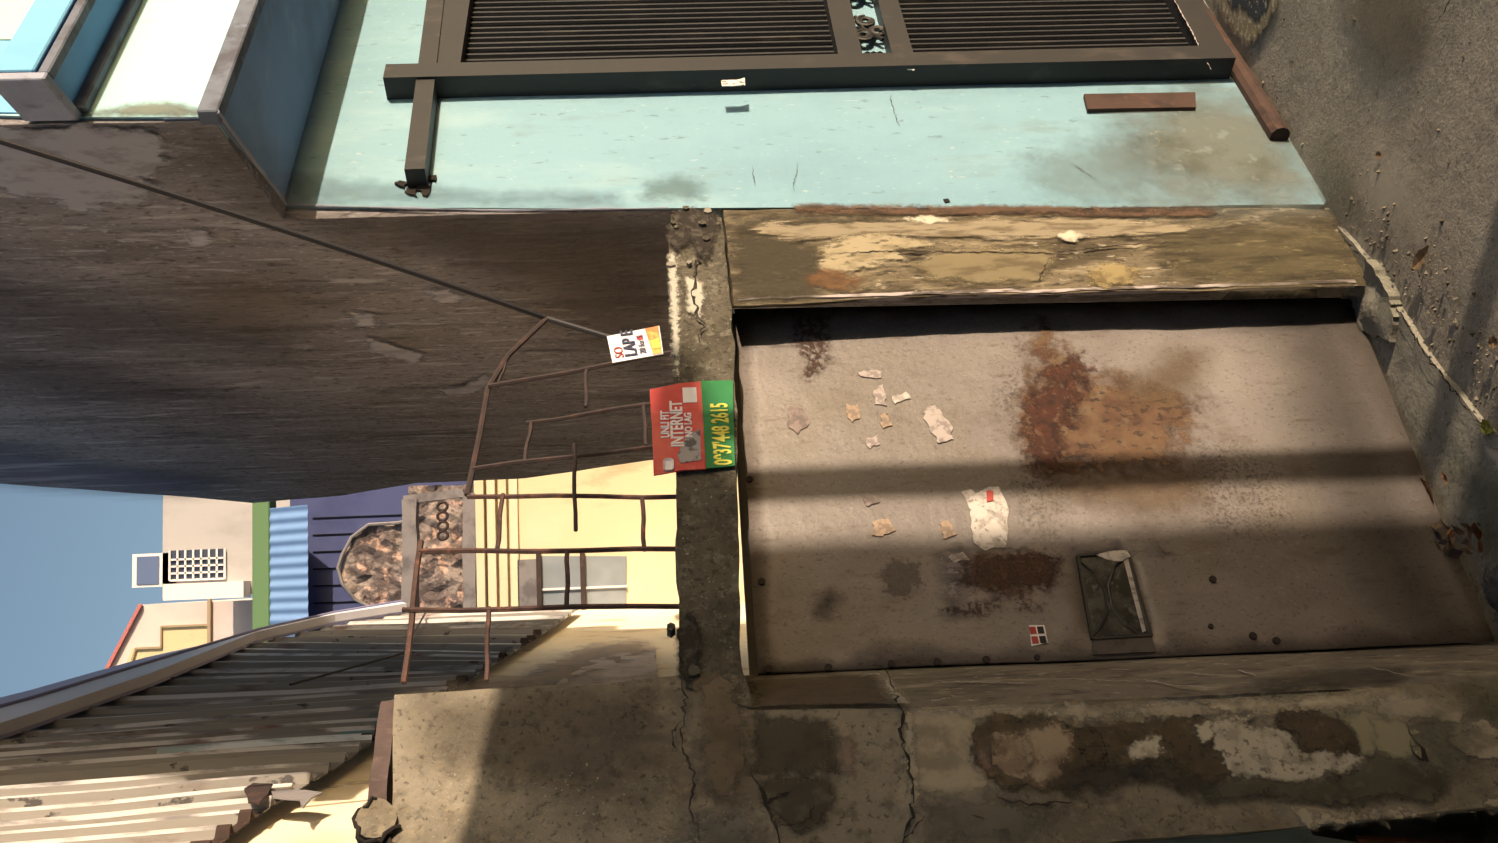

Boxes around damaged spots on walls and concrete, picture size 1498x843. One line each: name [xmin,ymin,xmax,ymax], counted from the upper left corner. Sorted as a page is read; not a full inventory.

peeling [751,203,1217,283]
crack [1321,205,1365,261]
corrosion [793,315,831,377]
corrosion [1012,317,1198,504]
crack [1394,304,1496,433]
crack [671,676,700,840]
crack [750,769,815,843]
crack [880,666,924,843]
spalling [912,691,1498,794]